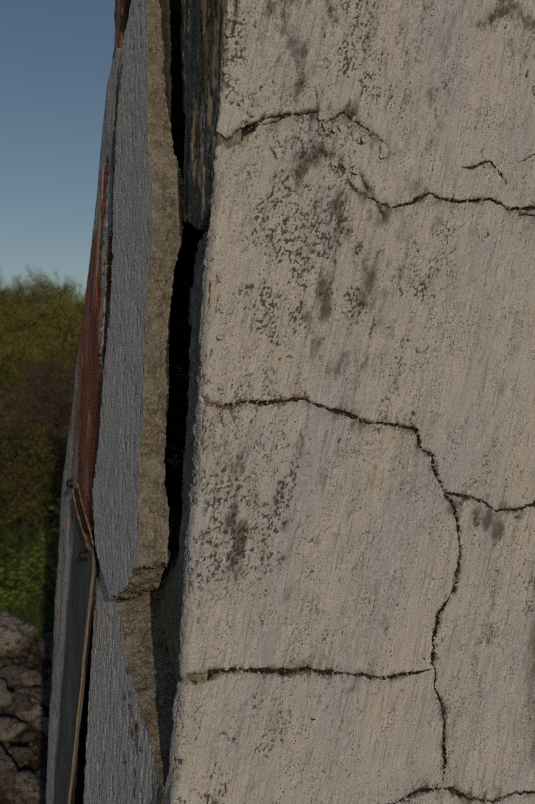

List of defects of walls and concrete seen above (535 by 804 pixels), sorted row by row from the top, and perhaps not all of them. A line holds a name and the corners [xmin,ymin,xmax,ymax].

spalling [103,48,121,244]
crack [227,111,385,144]
crack [351,161,535,217]
corrosion [69,165,113,551]
spalling [98,291,110,375]
spalling [110,0,242,786]
crack [189,397,535,804]
spalling [73,608,95,804]